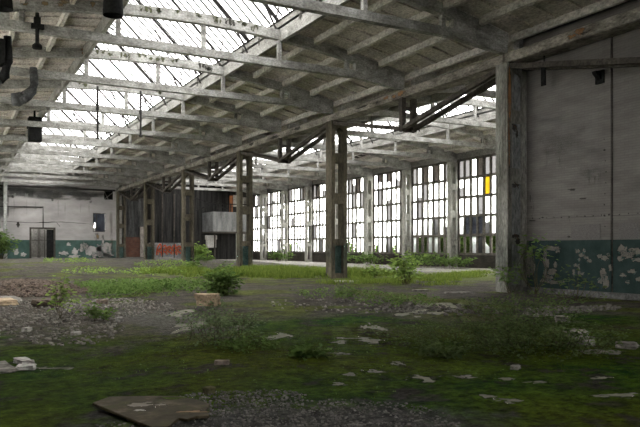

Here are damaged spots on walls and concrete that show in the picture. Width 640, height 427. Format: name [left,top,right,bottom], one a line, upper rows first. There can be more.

peeling [59,240,114,258]
peeling [540,245,565,284]
peeling [572,244,640,289]